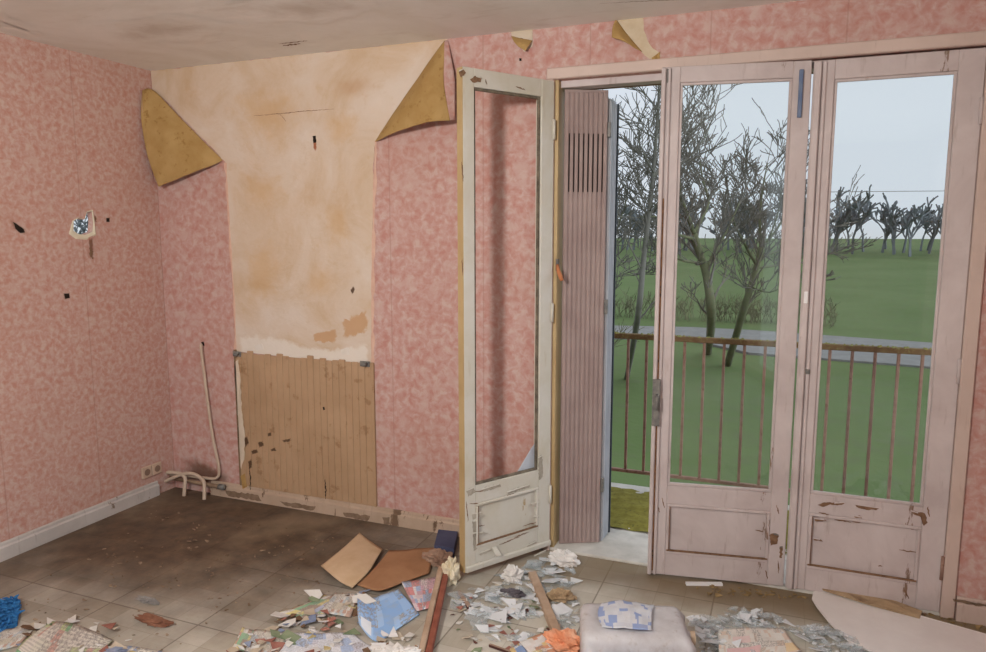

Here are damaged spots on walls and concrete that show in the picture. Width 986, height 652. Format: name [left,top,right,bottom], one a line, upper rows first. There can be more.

flaking render [617,18,661,59]
spalling [69,210,111,260]
flaking render [151,39,447,501]